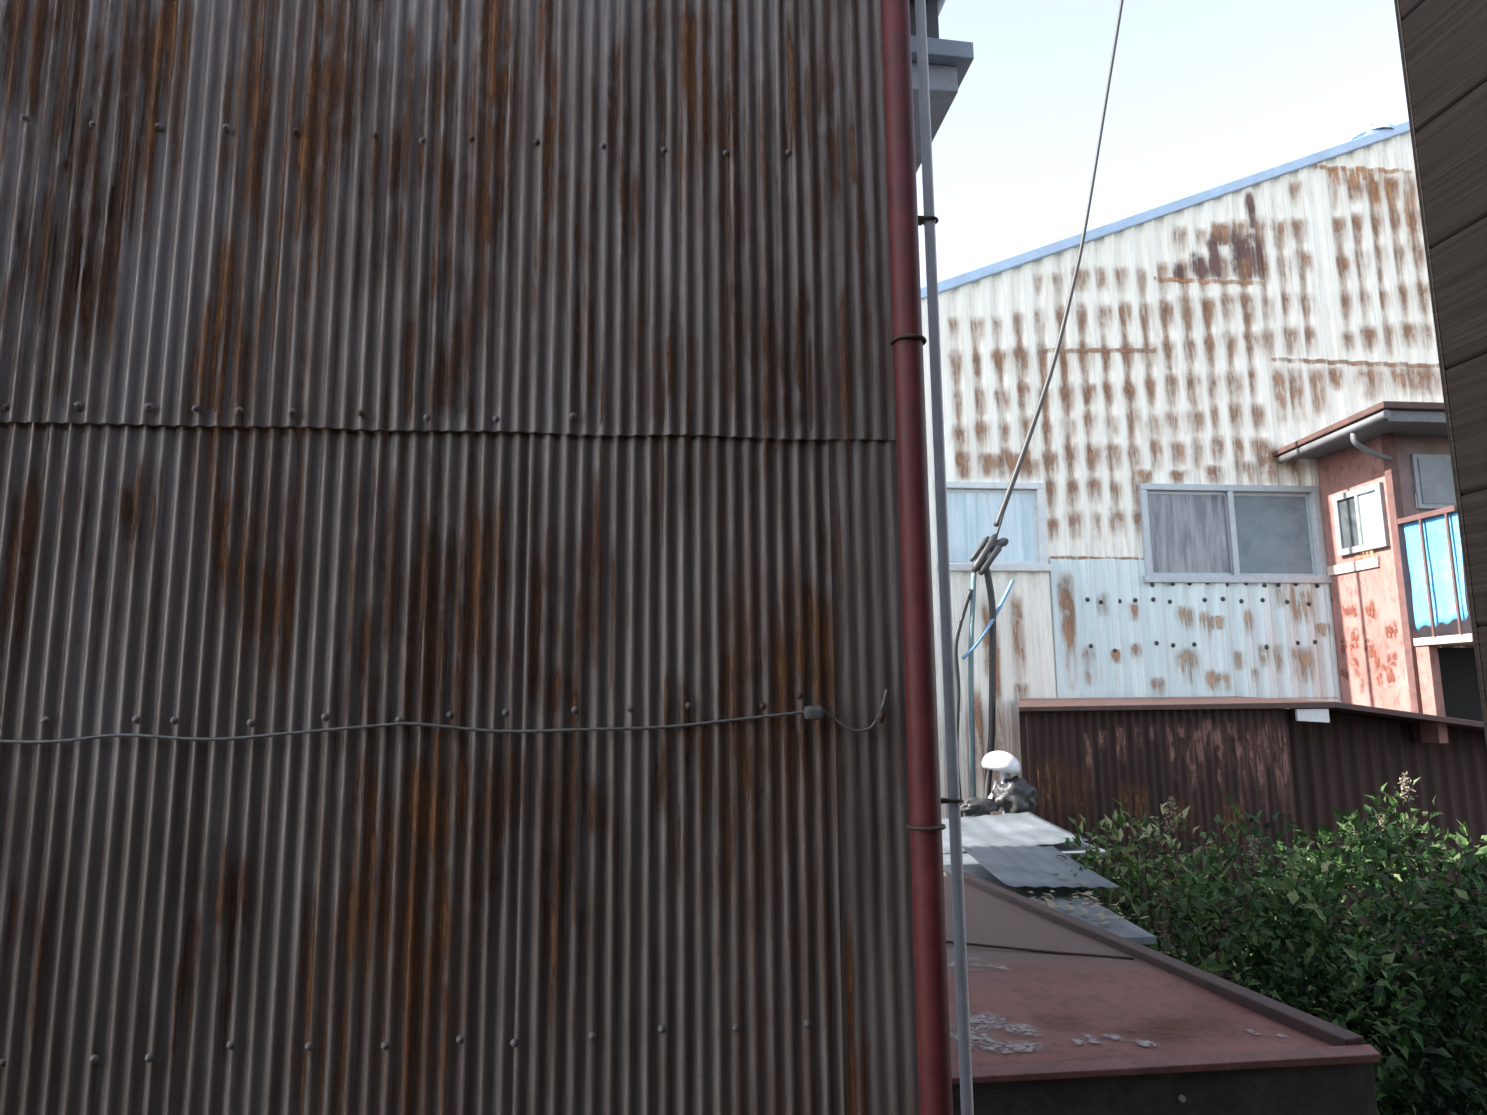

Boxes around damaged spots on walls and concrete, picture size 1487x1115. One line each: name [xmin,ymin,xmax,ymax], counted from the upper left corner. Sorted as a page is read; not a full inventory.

corrosion [0,0,191,362]
corrosion [190,0,379,686]
corrosion [532,0,595,315]
corrosion [949,193,1439,537]
corrosion [1315,165,1430,309]
corrosion [3,482,38,647]
corrosion [290,0,524,1115]
corrosion [529,300,618,1026]
corrosion [1058,584,1090,679]
corrosion [1111,644,1137,662]
corrosion [1178,607,1224,630]
corrosion [1181,647,1311,689]